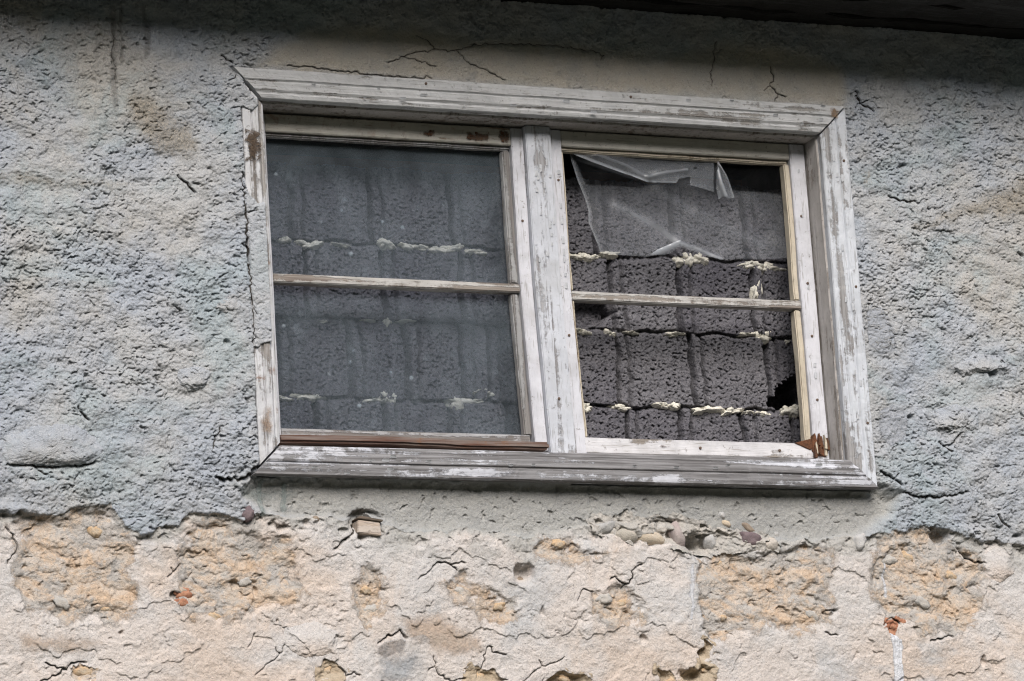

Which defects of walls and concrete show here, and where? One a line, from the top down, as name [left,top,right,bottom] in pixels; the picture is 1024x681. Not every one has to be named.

crack [291,37,604,80]
crack [241,172,257,344]
spalling [11,507,139,626]
spalling [170,518,311,624]
crack [577,564,641,601]
spalling [586,509,835,681]
spalling [868,527,990,638]
crack [41,661,82,681]
spalling [315,658,350,681]
crack [428,646,506,681]
spalling [462,662,507,681]
spalling [546,668,594,681]